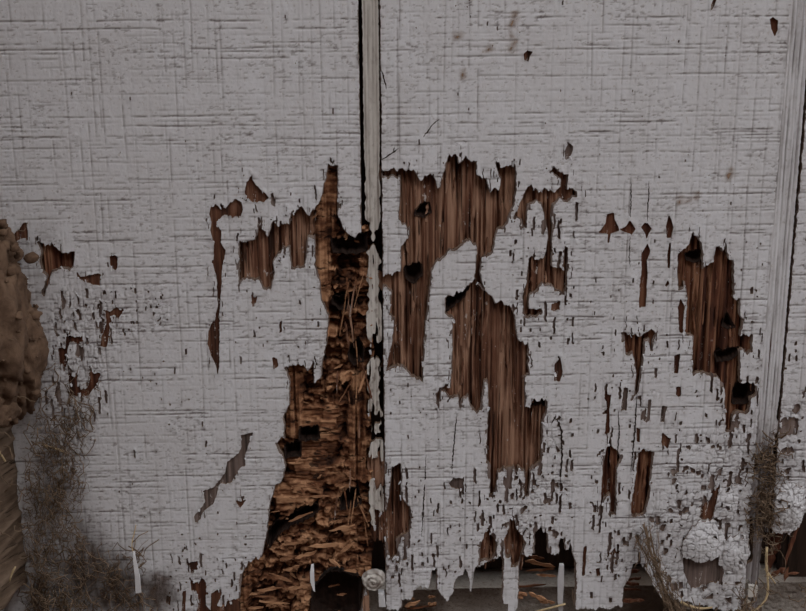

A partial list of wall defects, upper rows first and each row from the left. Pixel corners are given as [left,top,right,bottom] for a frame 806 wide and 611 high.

peeling [40,243,101,291]
peeling [110,255,118,272]
peeling [599,213,651,307]
peeling [58,334,101,398]
peeling [100,307,124,347]
spalling [182,155,575,611]
peeling [601,329,654,517]
peeling [665,216,750,429]